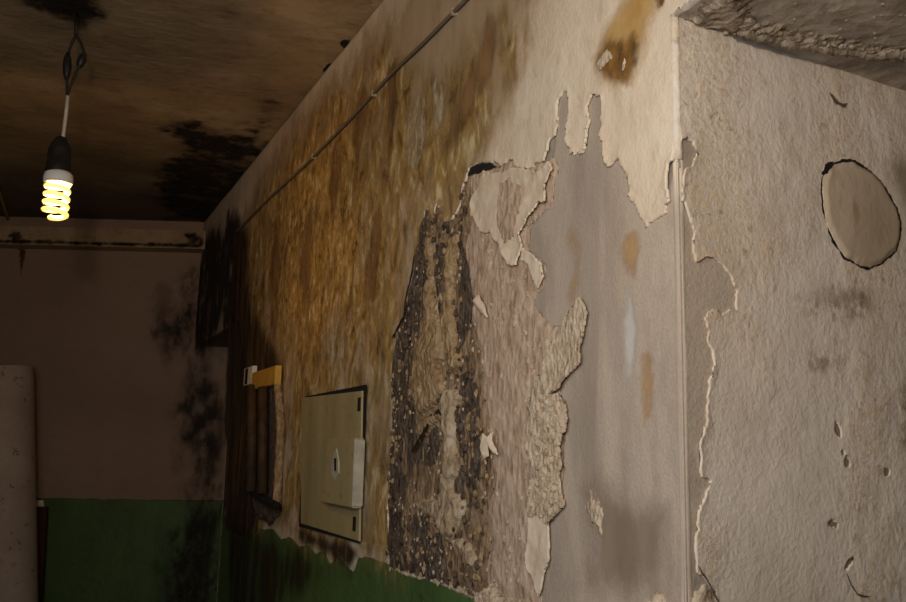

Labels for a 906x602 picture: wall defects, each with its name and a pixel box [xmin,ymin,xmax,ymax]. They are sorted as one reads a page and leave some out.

corrosion [596,0,664,81]
flaking render [684,0,906,63]
water stain [156,0,527,563]
peeling [385,91,736,602]
water stain [166,370,225,602]